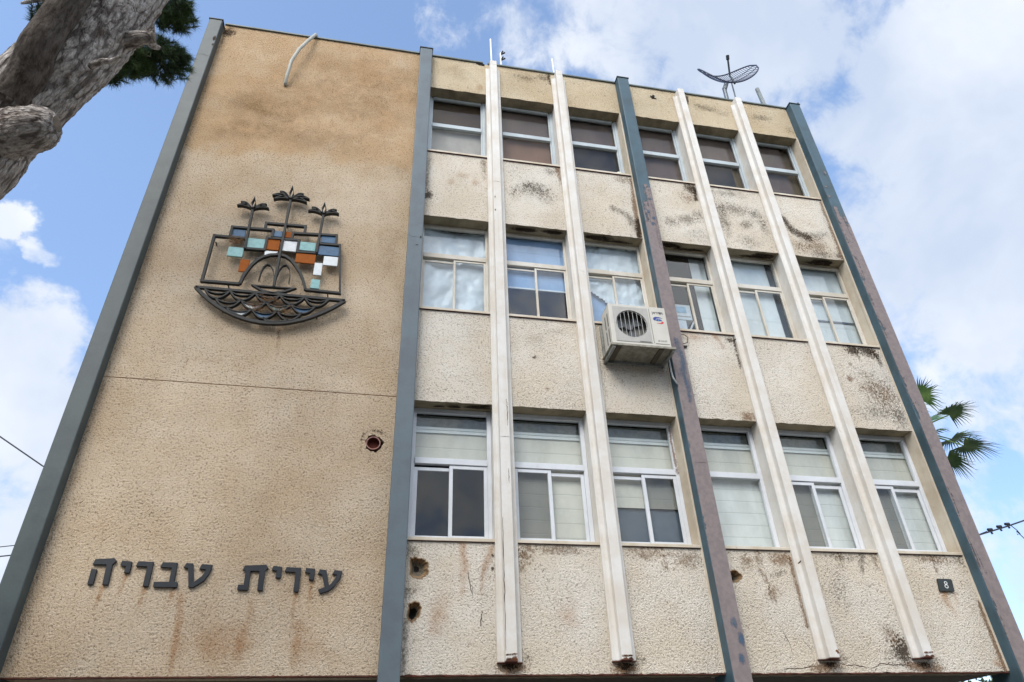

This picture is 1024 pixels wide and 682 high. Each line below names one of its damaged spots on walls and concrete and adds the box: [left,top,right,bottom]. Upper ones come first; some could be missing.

leakage [782,216,818,247]
mould [844,346,882,367]
peeling [643,184,753,682]
hole [410,557,429,579]
hole [407,601,422,623]